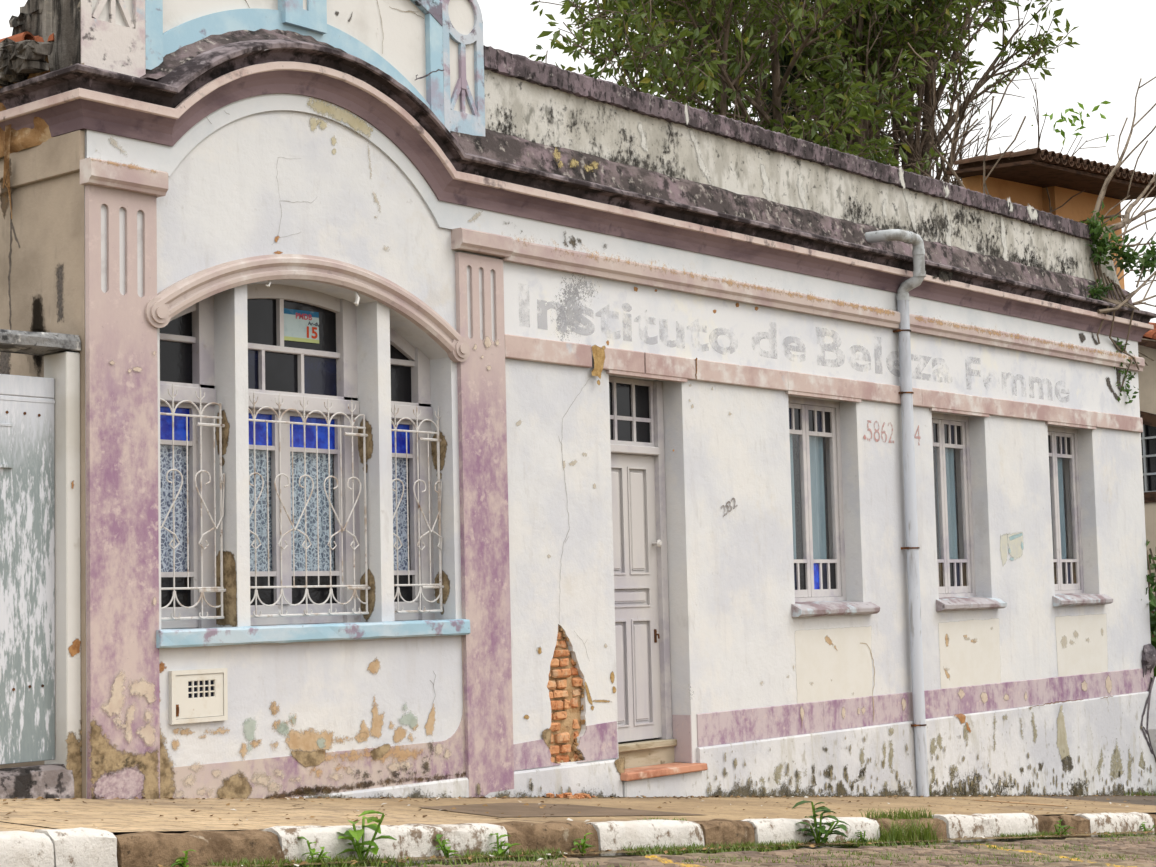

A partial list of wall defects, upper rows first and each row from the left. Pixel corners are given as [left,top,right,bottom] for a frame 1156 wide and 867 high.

leakage [580,104,713,186]
leakage [843,166,1078,275]
leakage [30,264,64,332]
leakage [0,352,11,375]
flaking render [592,345,606,385]
peeling [93,767,144,799]
peeling [101,672,156,746]
peeling [240,697,451,791]
peeling [368,659,380,673]
flaking render [537,625,616,764]
leakage [707,728,913,797]
leakage [929,705,1156,796]